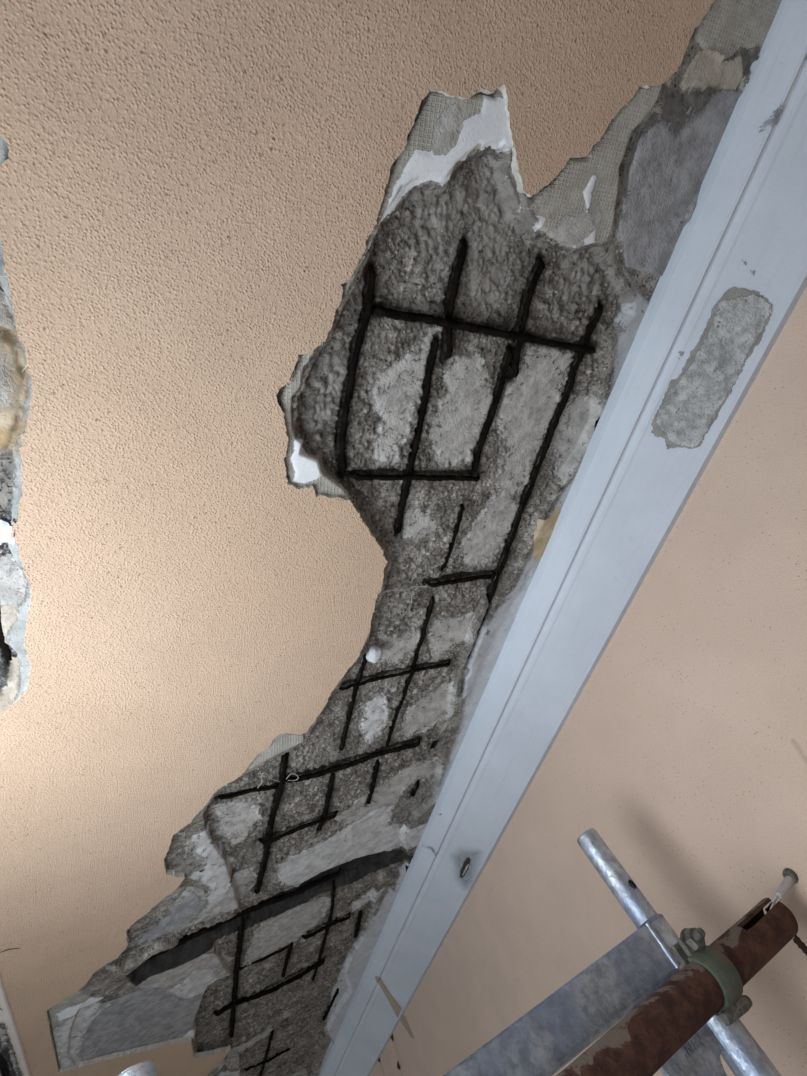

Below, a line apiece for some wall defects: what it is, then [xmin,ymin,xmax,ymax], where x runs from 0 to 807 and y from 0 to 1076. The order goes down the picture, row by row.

spalling [0,136,9,164]
peeling [651,287,772,449]
spalling [0,238,33,712]